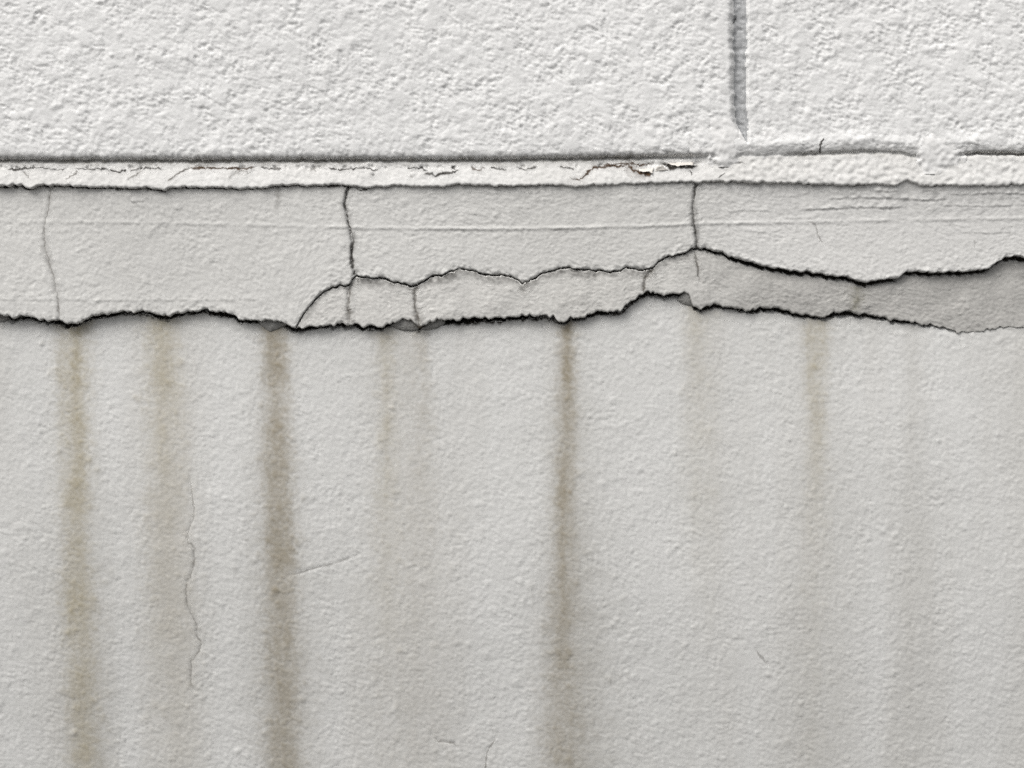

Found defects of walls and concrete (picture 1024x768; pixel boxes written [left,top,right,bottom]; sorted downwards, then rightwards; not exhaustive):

crack [0,164,1024,332]
peeling [296,248,1024,333]
damp [228,319,496,768]
damp [509,314,640,768]
damp [657,298,738,768]